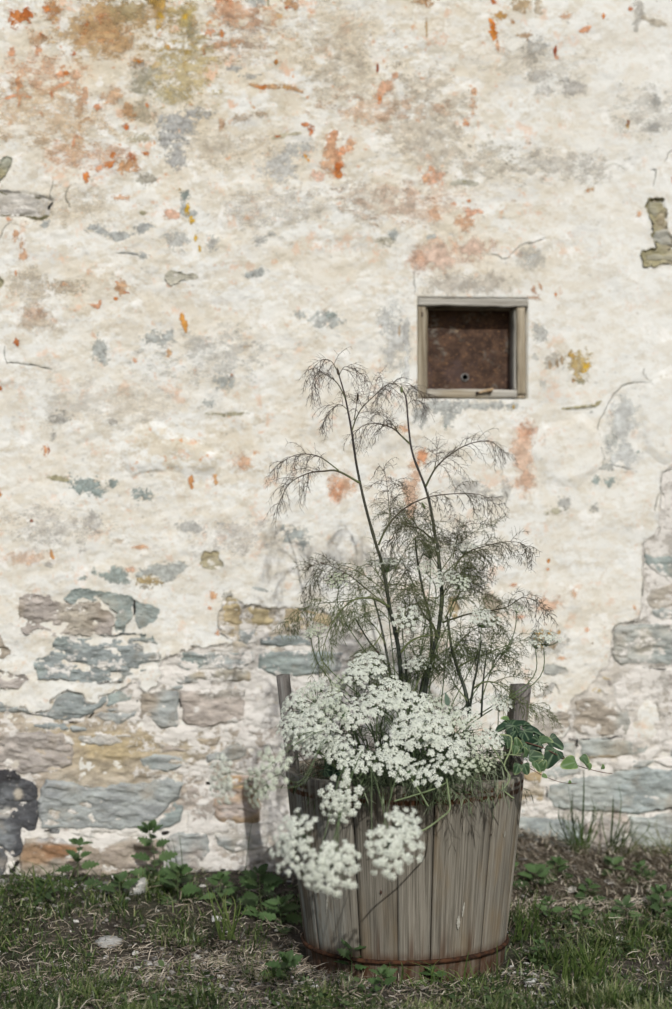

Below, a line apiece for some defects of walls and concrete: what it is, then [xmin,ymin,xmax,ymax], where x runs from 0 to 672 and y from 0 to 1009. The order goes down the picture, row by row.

spalling [641,197,672,267]
crack [597,370,649,469]
peeling [592,462,618,488]
spalling [199,551,224,570]
spalling [484,594,540,612]
spalling [519,466,672,855]
spalling [0,561,383,876]